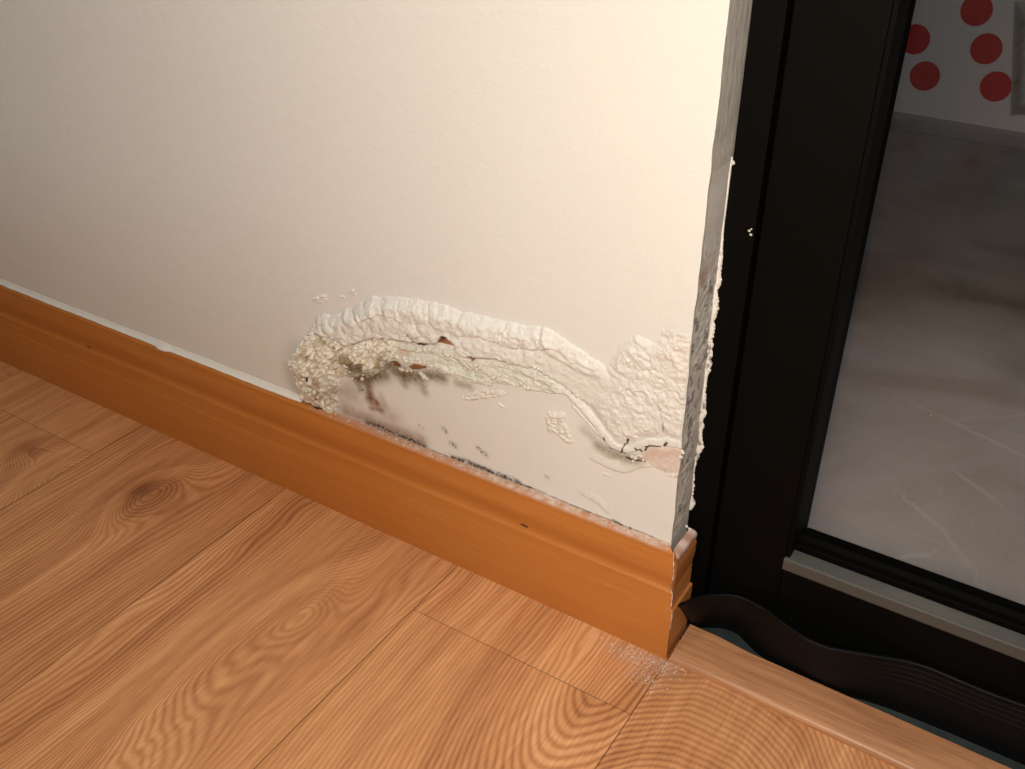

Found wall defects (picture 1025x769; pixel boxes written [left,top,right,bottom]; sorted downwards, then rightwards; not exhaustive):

flaking render [382,336,611,449]
flaking render [626,156,735,531]